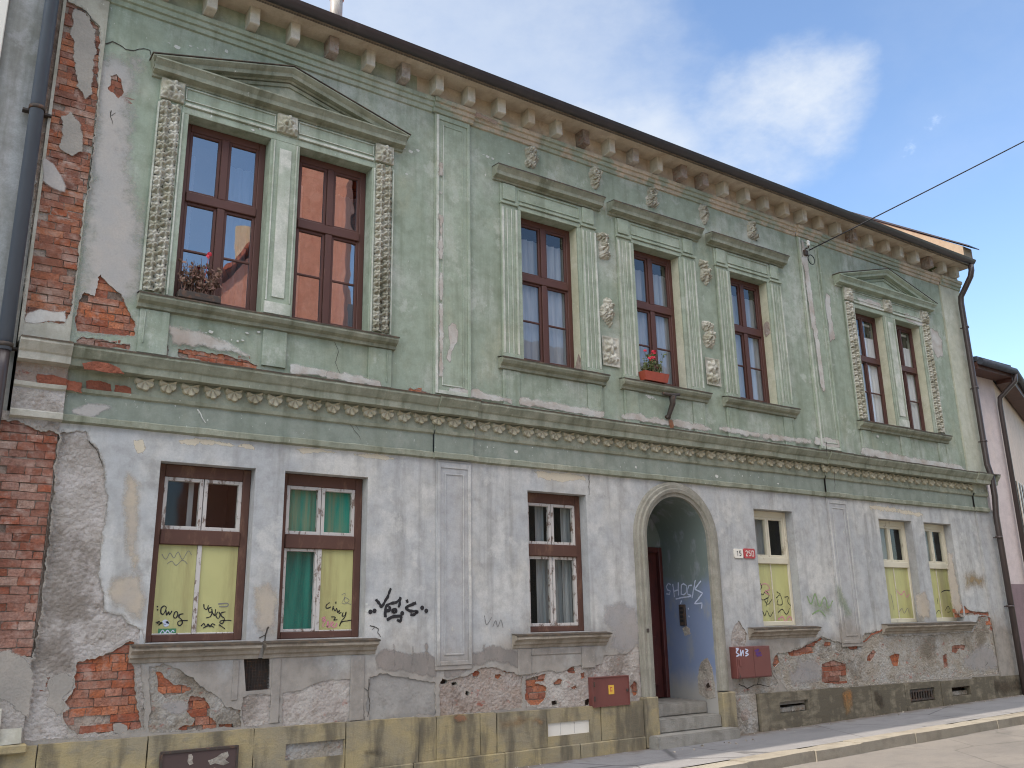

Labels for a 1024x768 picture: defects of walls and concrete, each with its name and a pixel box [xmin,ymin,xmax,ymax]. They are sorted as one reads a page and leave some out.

flaking render [23,0,144,350]
flaking render [36,361,131,417]
peeling [166,325,260,368]
flaking render [0,419,642,741]
flaking render [733,554,1000,695]